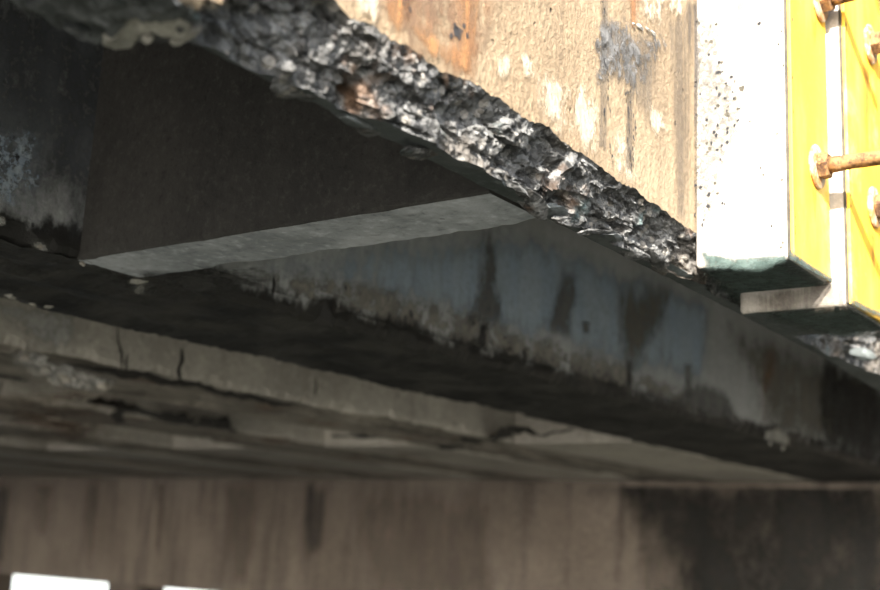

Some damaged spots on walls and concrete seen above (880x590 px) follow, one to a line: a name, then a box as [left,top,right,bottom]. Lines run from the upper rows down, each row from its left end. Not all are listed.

damp [0,0,104,218]
spalling [10,0,751,307]
corrosion [386,0,488,71]
damp [542,0,698,211]
crack [71,331,317,432]
crack [438,425,578,450]
damp [340,235,880,462]
spalling [794,332,880,374]